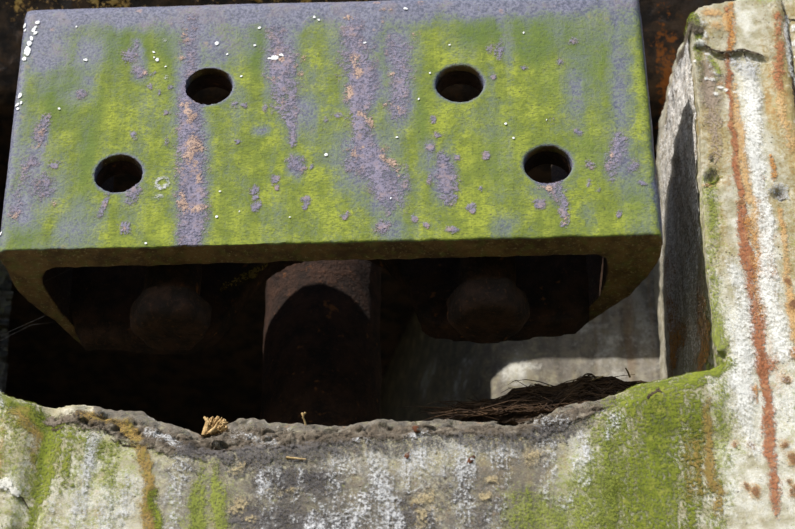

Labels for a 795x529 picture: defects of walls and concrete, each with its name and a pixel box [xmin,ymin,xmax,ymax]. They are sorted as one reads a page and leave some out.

leakage [163,15,795,529]
crack [703,43,764,62]
rust [701,2,795,518]